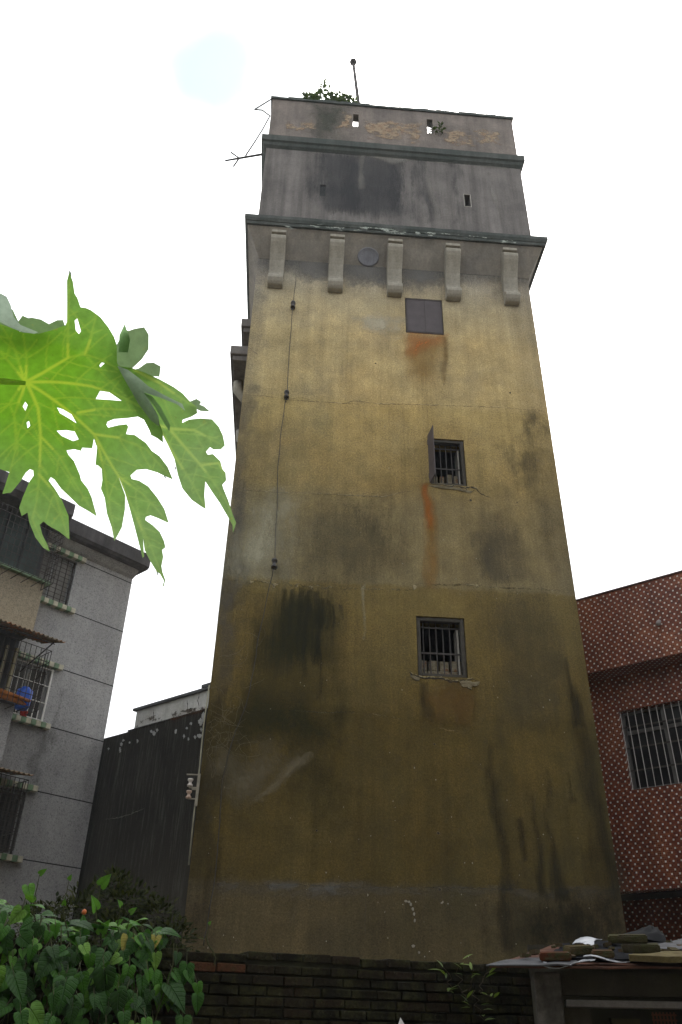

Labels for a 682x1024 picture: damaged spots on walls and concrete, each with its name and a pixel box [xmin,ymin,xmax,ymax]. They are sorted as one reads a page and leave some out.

damp [321,154,400,213]